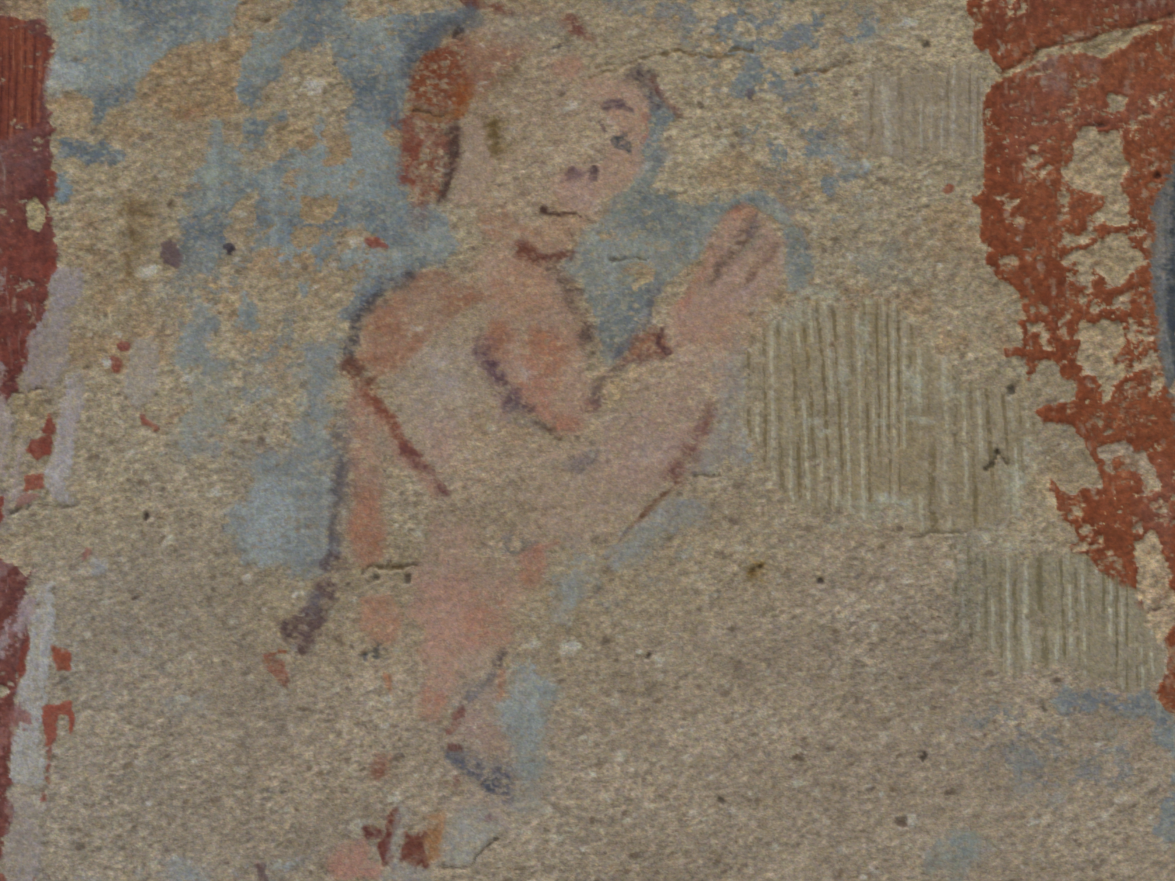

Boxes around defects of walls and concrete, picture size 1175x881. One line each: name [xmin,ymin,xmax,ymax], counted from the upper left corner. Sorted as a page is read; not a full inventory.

crack [951,13,1175,83]
peeling [995,194,1025,227]
peeling [9,276,55,324]
peeling [0,656,31,705]